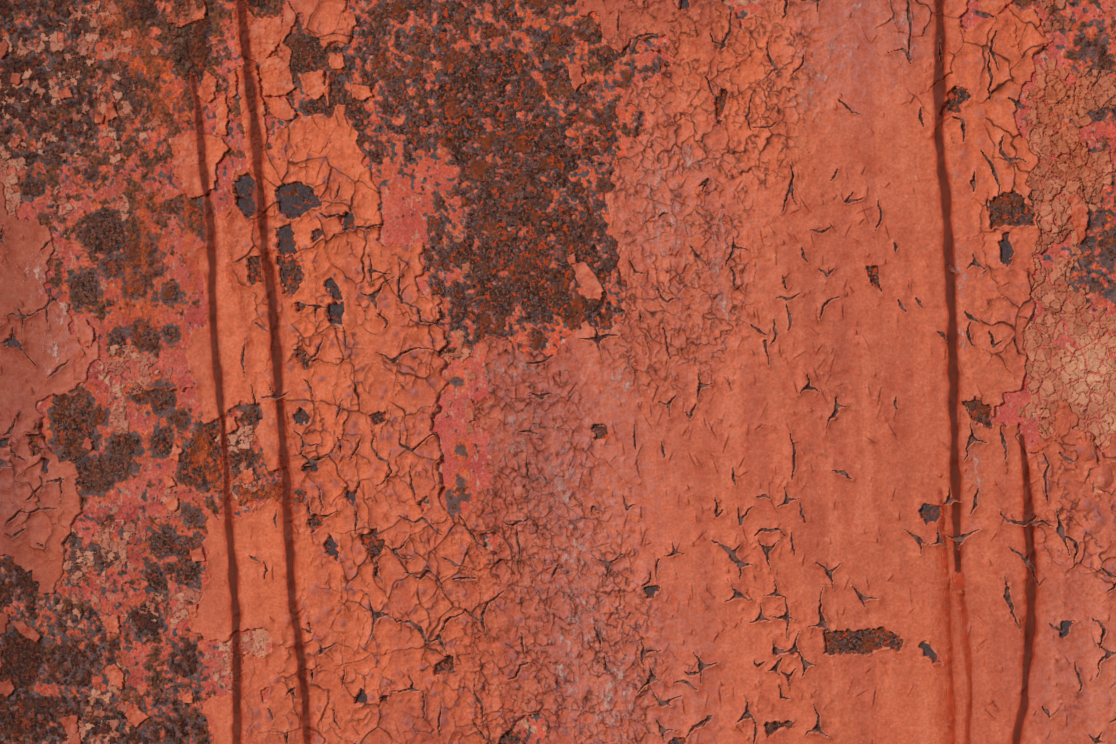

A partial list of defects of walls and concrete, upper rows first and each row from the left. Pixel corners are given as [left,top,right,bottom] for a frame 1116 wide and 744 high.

corrosion [0,0,311,744]
peeling [0,0,673,744]
corrosion [285,0,670,359]
crack [751,167,898,365]
corrosion [932,0,972,744]
peeling [961,0,1116,457]
crack [294,400,505,658]
peeling [764,720,794,737]
crack [712,433,878,736]
peeling [823,626,904,655]
crack [905,452,1079,632]
corrosion [1012,434,1037,744]